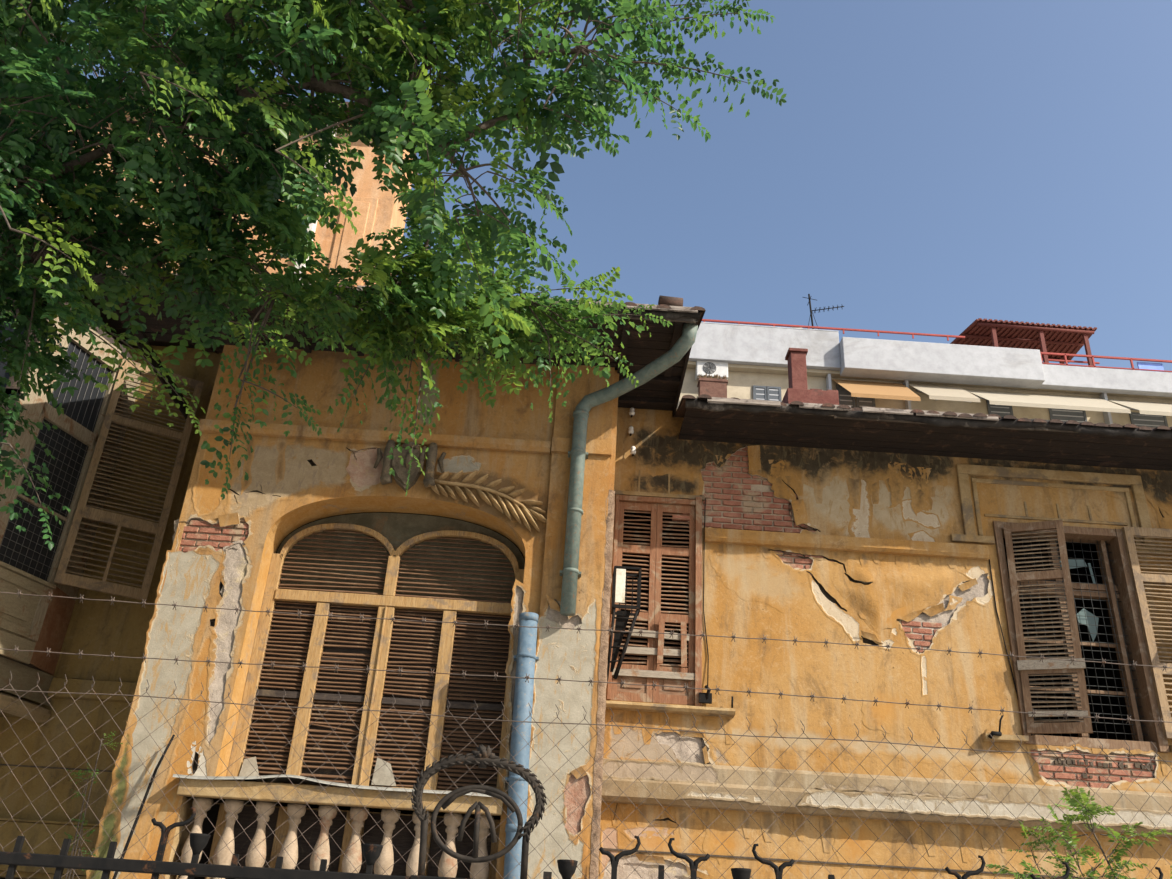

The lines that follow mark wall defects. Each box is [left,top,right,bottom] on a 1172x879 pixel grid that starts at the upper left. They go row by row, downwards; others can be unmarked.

peeling [435,453,483,475]
flaking render [672,445,961,543]
crack [769,480,871,612]
leakage [618,420,1172,542]
peeling [114,441,384,879]
peeling [499,490,1172,879]